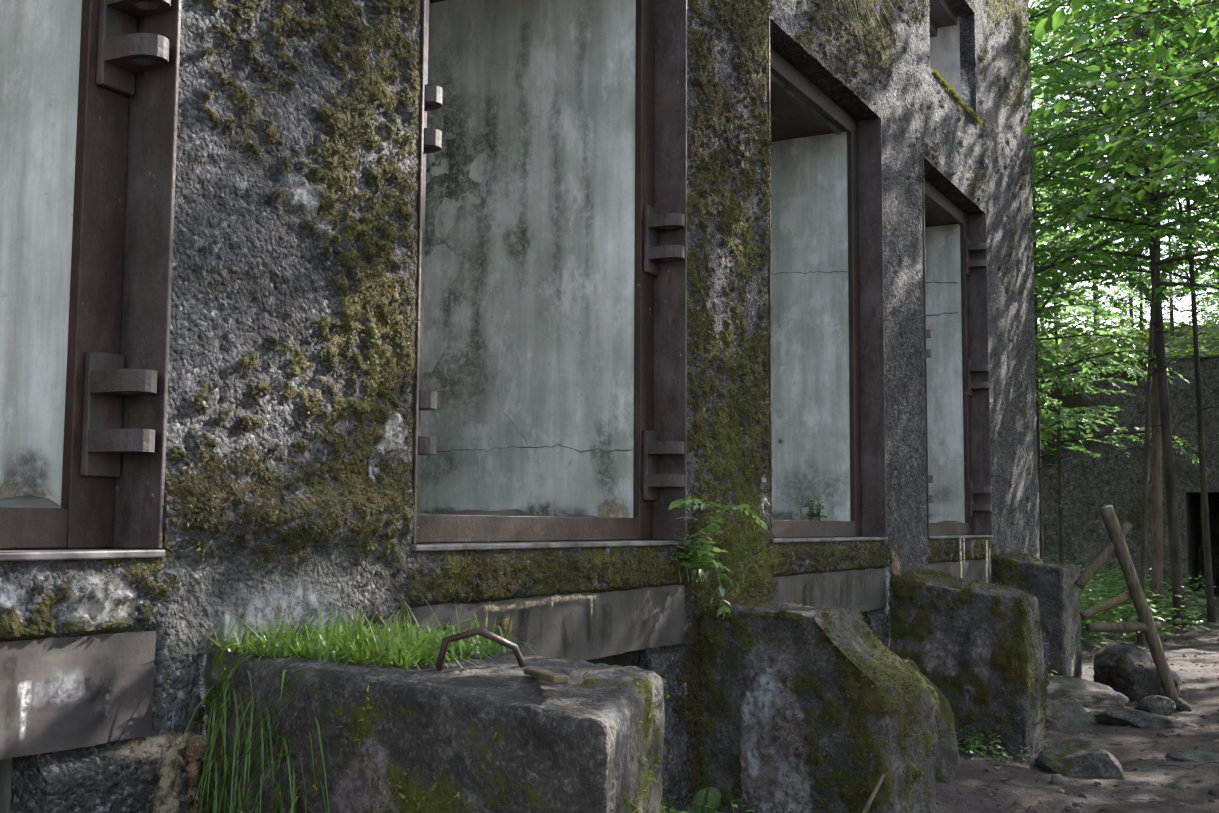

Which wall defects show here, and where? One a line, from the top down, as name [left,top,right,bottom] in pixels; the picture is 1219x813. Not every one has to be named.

crack [440,334,632,453]